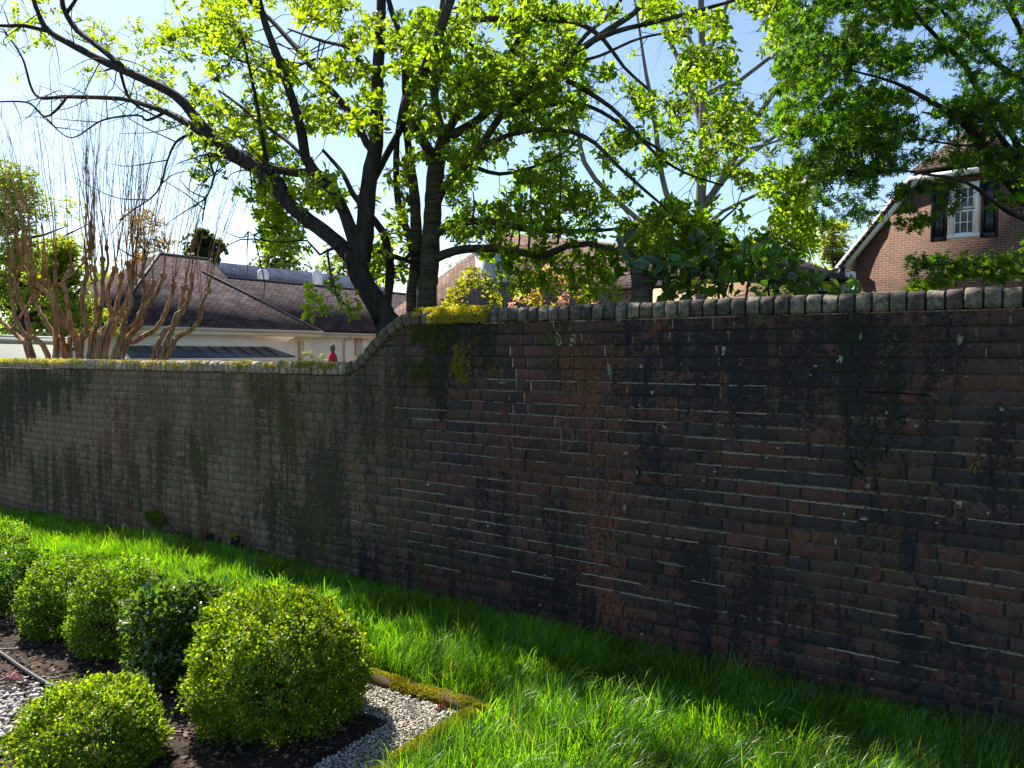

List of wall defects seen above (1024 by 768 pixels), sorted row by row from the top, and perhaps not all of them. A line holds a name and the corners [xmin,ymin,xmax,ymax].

leakage [77,311,1024,725]